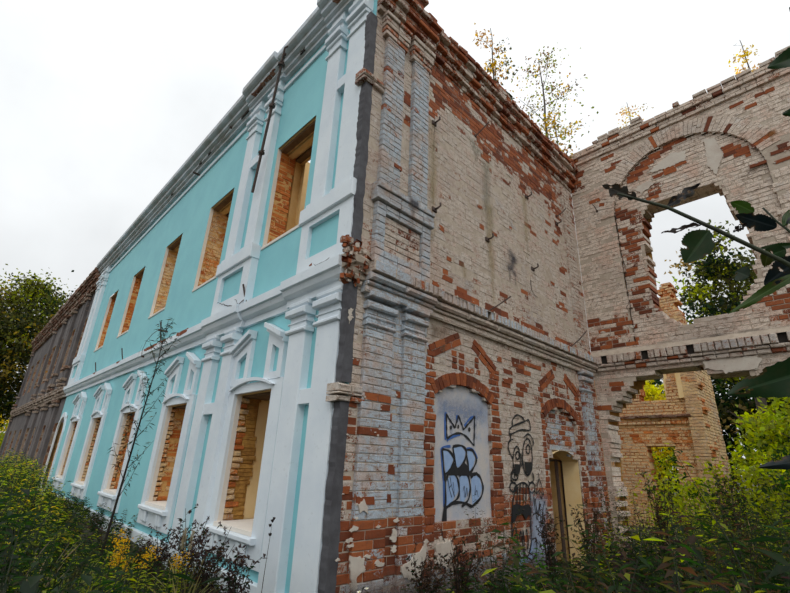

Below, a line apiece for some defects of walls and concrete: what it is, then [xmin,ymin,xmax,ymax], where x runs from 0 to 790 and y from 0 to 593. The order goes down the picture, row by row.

flaking render [428,65,562,243]
spalling [627,137,687,201]
spalling [721,139,790,169]
spalling [339,235,372,287]
spalling [349,391,401,411]
spalling [609,381,625,391]
spalling [342,486,375,506]
flaking render [335,517,359,562]
flaking render [364,517,400,576]